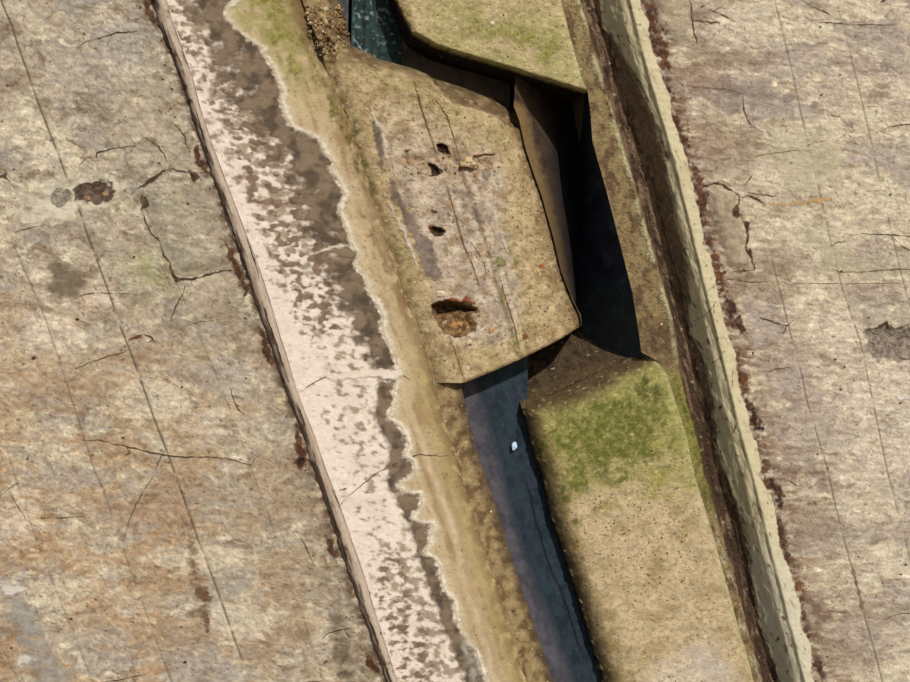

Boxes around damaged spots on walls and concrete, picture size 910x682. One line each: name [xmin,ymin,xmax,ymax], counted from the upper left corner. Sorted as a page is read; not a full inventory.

corrosion [642,0,671,92]
crack [691,5,735,43]
spalling [51,179,125,209]
leakage [460,133,496,199]
corrosion [691,162,710,226]
leakage [169,0,490,682]
spalling [431,291,479,345]
corrosion [708,239,746,333]
spalling [865,317,910,362]
crack [83,439,260,537]